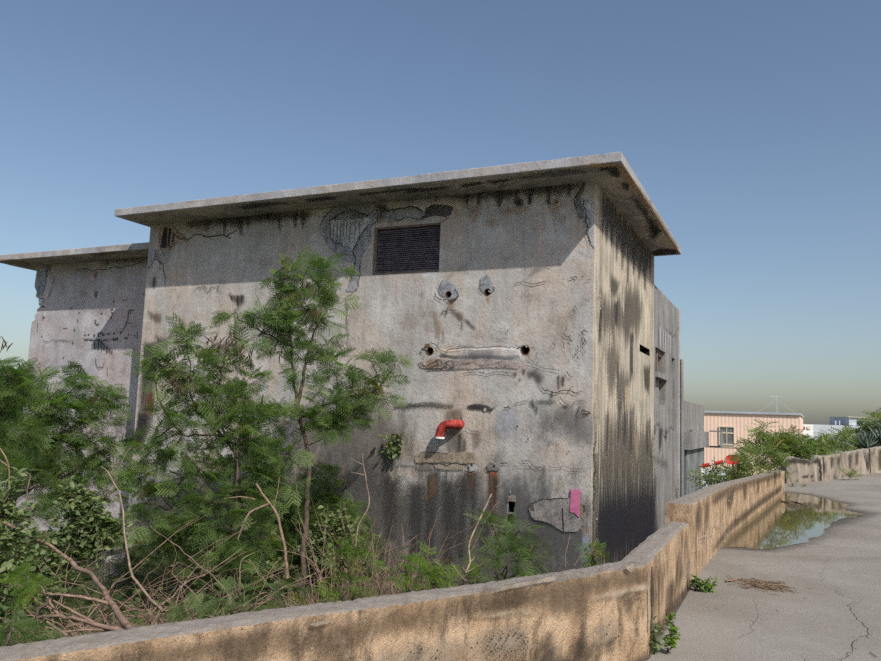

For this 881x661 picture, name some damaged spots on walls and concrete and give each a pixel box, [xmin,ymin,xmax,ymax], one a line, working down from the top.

flaking render [320,204,424,293]
water stain [361,163,679,272]
water stain [135,278,667,615]
crack [462,275,602,520]
water stain [541,633,614,661]
water stain [653,556,692,644]